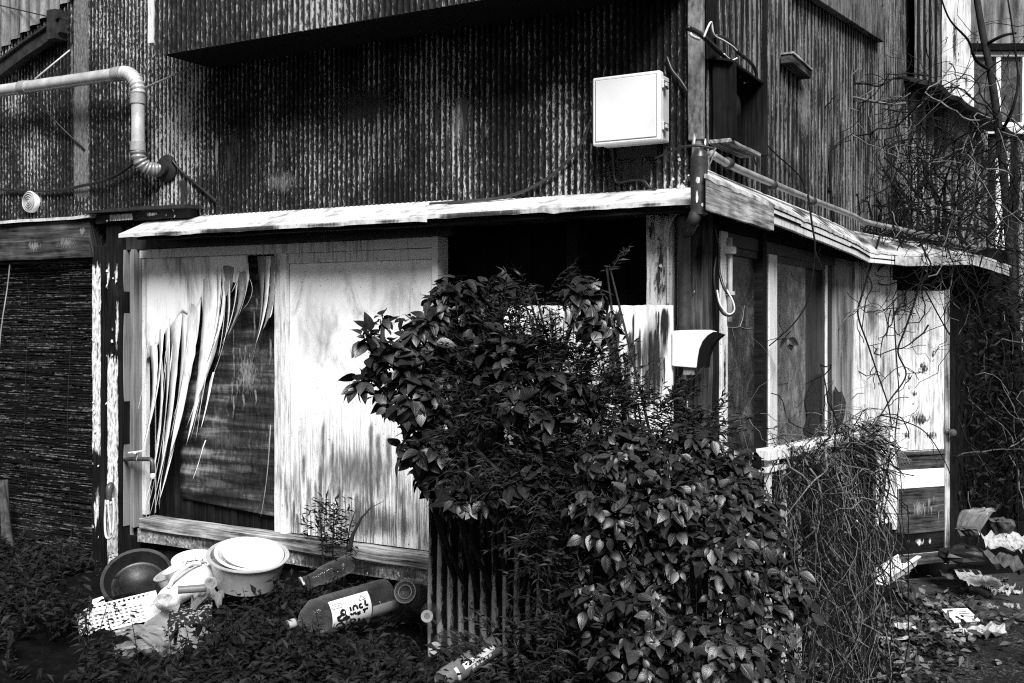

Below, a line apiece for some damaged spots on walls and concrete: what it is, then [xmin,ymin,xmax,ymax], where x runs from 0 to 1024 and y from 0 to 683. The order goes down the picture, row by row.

leakage [293,425,421,548]